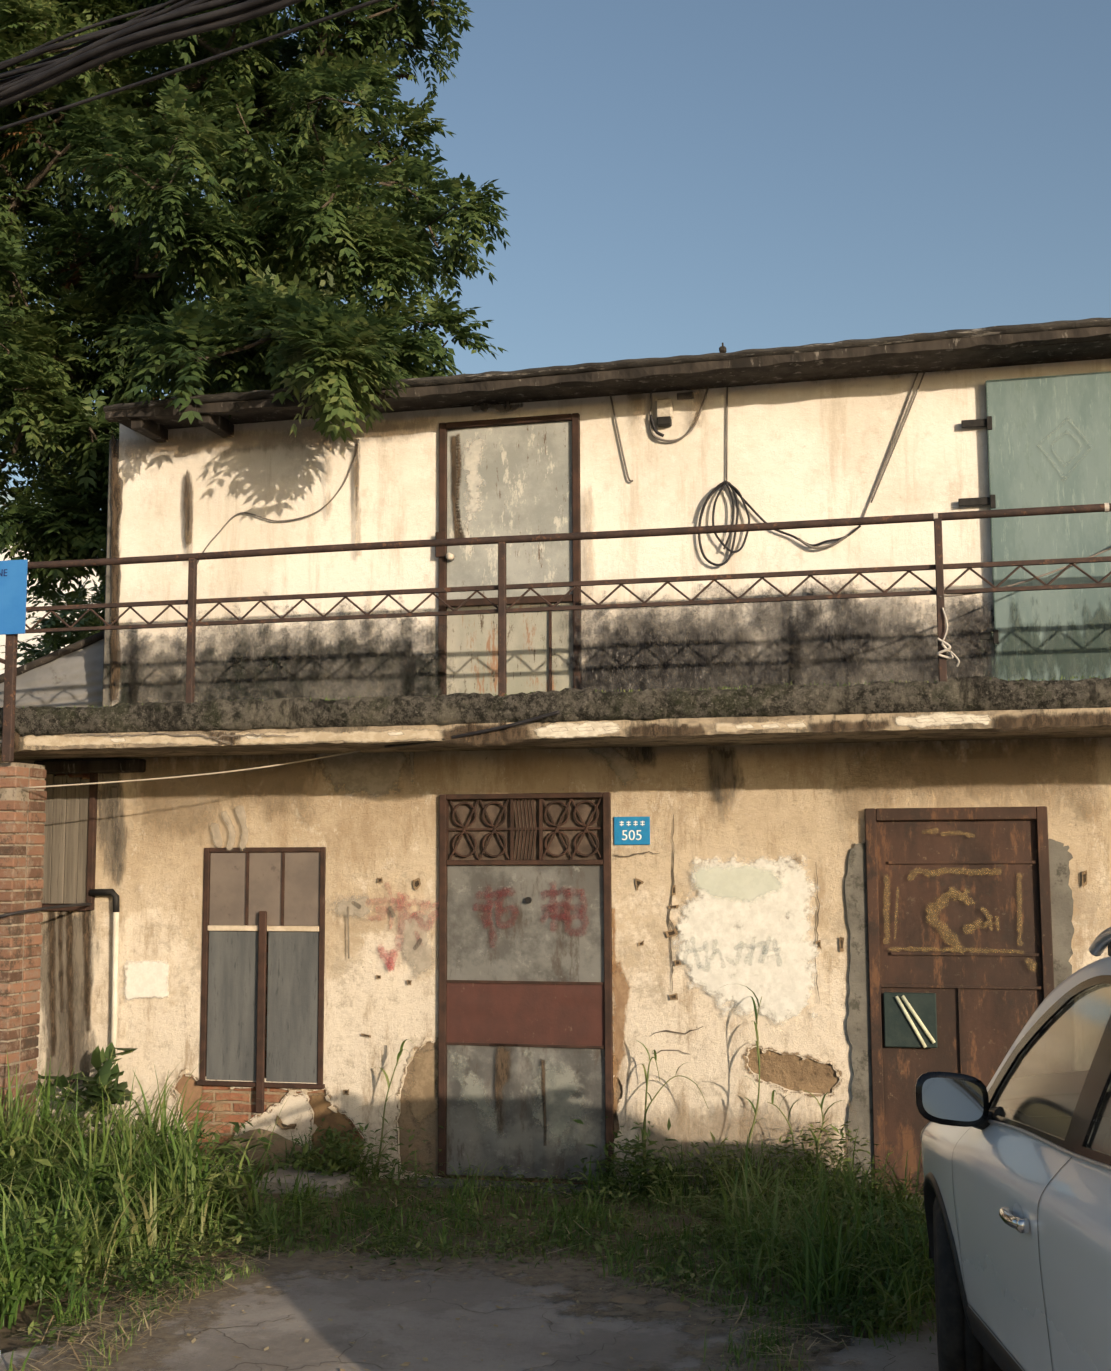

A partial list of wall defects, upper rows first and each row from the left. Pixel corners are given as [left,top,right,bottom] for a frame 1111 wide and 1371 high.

leakage [107,605,442,703]
leakage [572,583,994,693]
leakage [630,724,743,804]
crack [615,814,681,991]
spalling [170,1069,365,1166]
spalling [394,1037,501,1179]
rust [495,1046,510,1131]
spalling [613,1075,623,1138]
crack [651,1026,703,1054]
spalling [742,1044,842,1097]